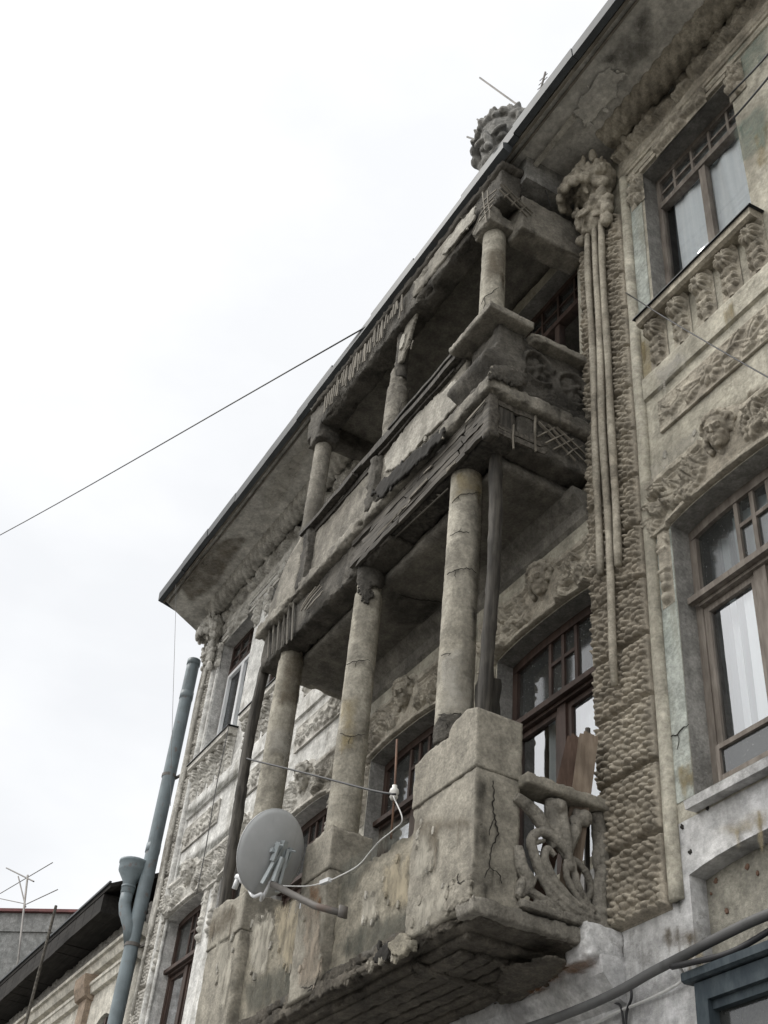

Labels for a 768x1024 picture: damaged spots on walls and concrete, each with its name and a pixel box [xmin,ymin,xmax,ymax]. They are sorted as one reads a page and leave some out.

flaking render [573,67,629,127]
flaking render [370,379,457,499]
crack [448,780,502,887]
flaking render [249,819,474,1005]
spalling [496,955,567,1005]